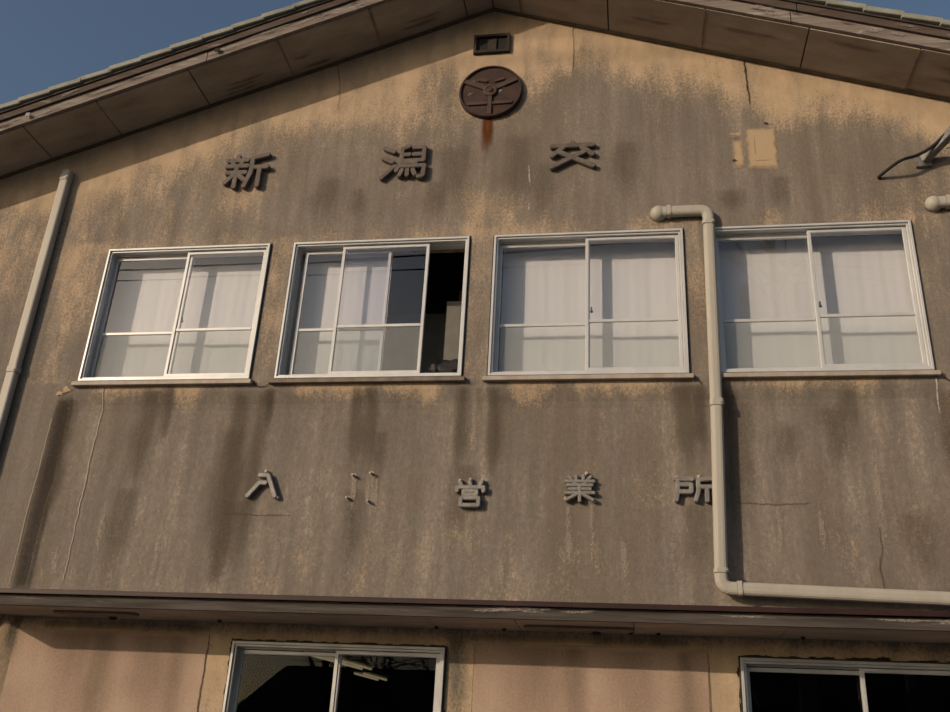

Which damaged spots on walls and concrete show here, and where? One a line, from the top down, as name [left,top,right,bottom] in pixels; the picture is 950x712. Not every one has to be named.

rust [483,119,492,144]
leakage [17,401,71,583]
crack [62,388,107,581]
leakage [723,393,739,486]